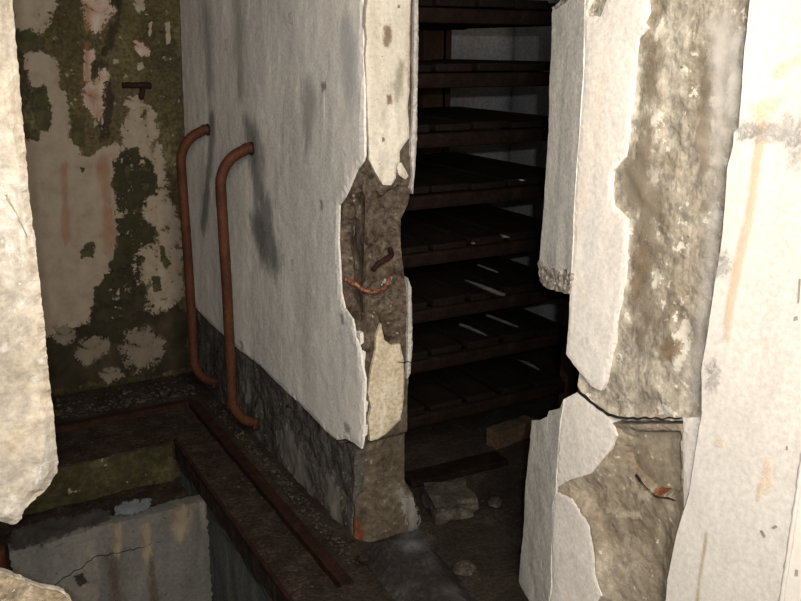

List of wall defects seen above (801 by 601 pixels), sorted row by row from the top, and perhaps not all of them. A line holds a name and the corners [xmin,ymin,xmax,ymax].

spalling [340,156,410,371]
flaking render [537,261,575,294]
crack [577,390,682,420]
spalling [558,0,750,601]
rust [726,100,771,320]
flaking render [0,573,71,601]